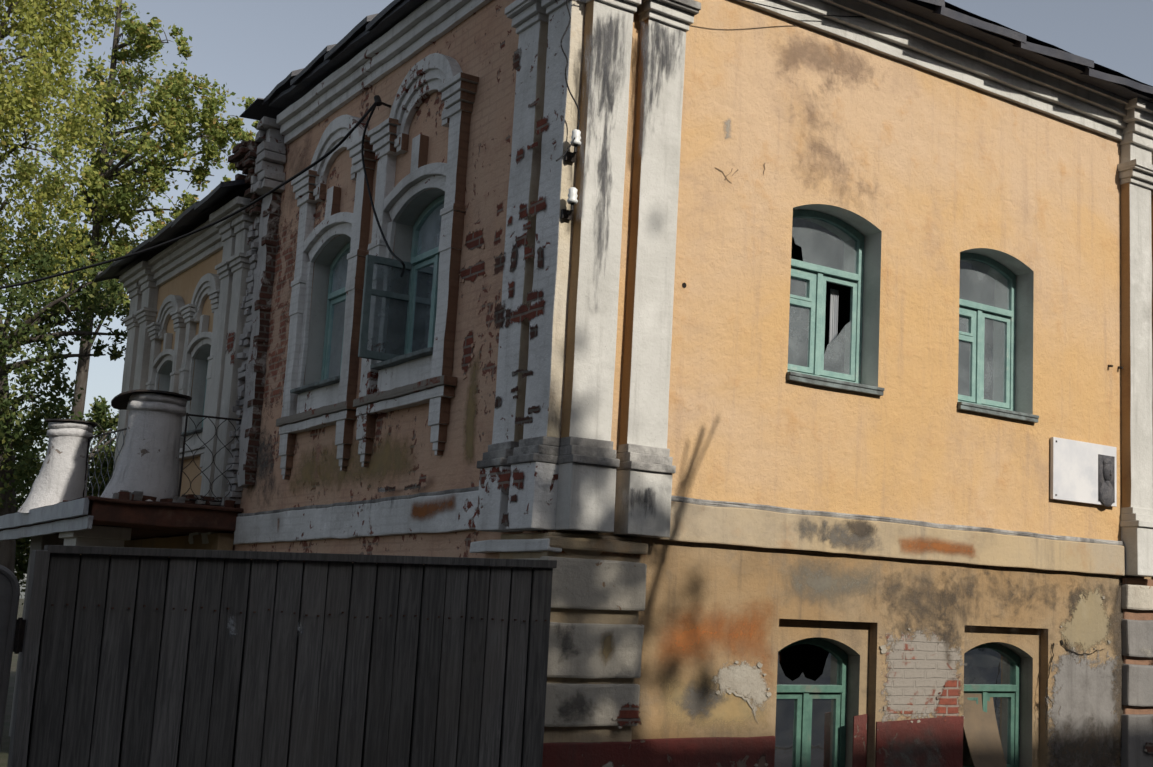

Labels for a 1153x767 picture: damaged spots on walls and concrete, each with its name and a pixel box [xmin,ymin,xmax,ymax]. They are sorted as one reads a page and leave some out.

damp [640,22,681,153]
spalling [516,114,549,162]
damp [583,17,625,265]
spalling [459,197,547,340]
peeling [263,219,297,418]
spalling [496,469,524,527]
damp [800,520,874,549]
damp [602,634,613,661]
peeling [712,660,772,715]
spalling [879,628,964,723]
damp [885,579,974,662]
damp [1048,586,1123,767]